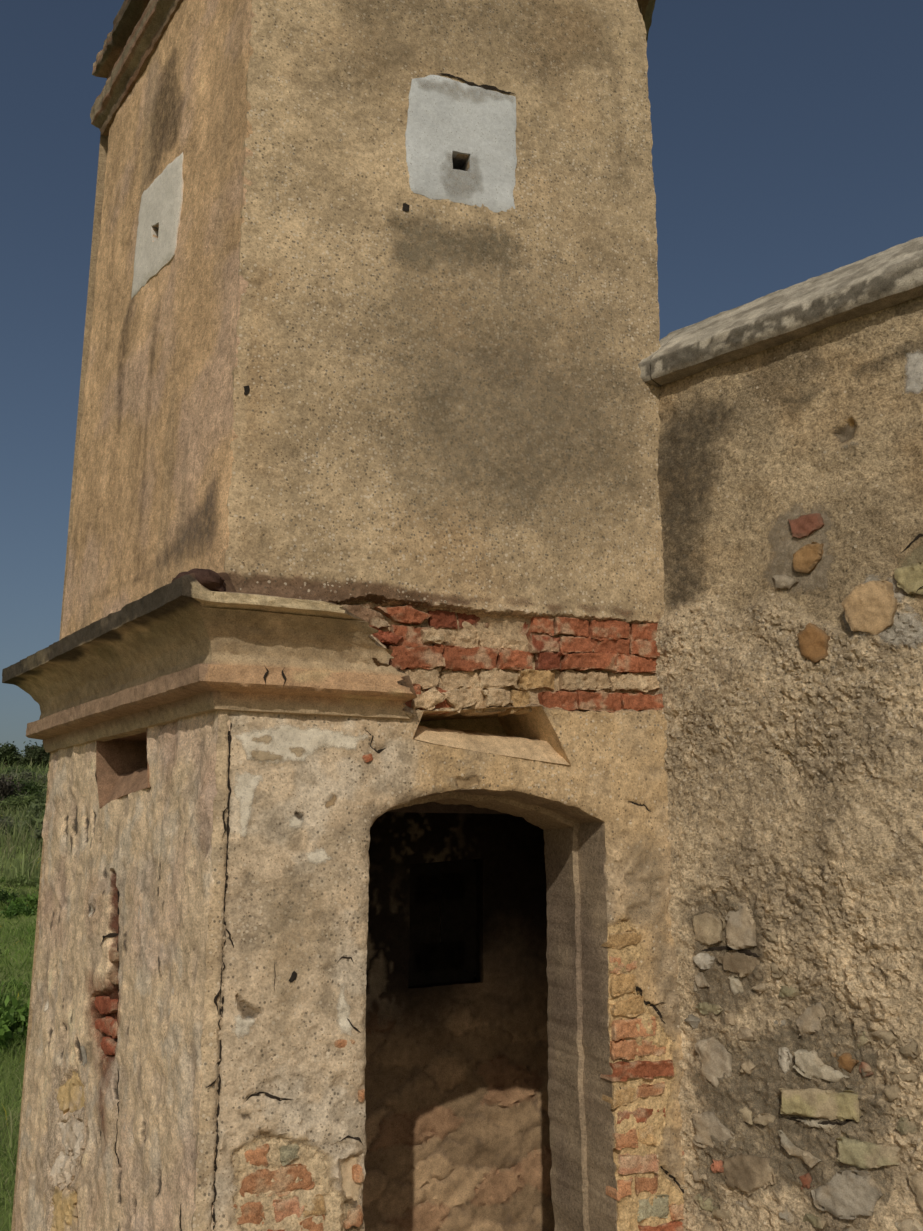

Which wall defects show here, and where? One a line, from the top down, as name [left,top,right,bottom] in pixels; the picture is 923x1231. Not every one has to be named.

crack [901,534,923,553]
flaking render [65,809,96,852]
crack [206,723,293,1229]
flaking render [233,1136,364,1231]